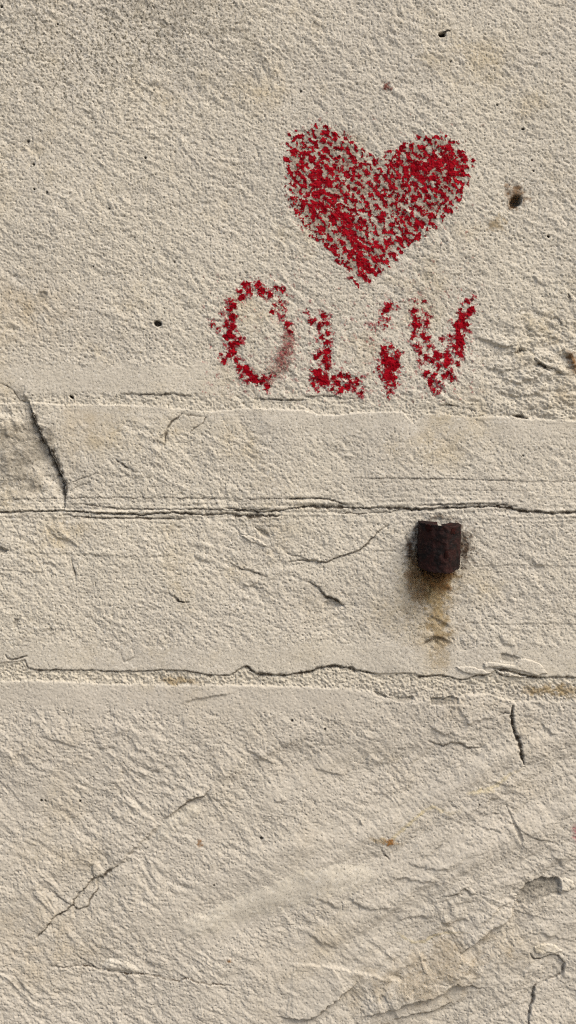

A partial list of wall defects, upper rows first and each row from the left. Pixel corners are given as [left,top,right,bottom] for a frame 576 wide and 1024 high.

crack [1,385,572,562]
rust [406,514,478,628]
crack [100,665,370,676]
crack [418,669,537,680]
crack [503,710,523,761]